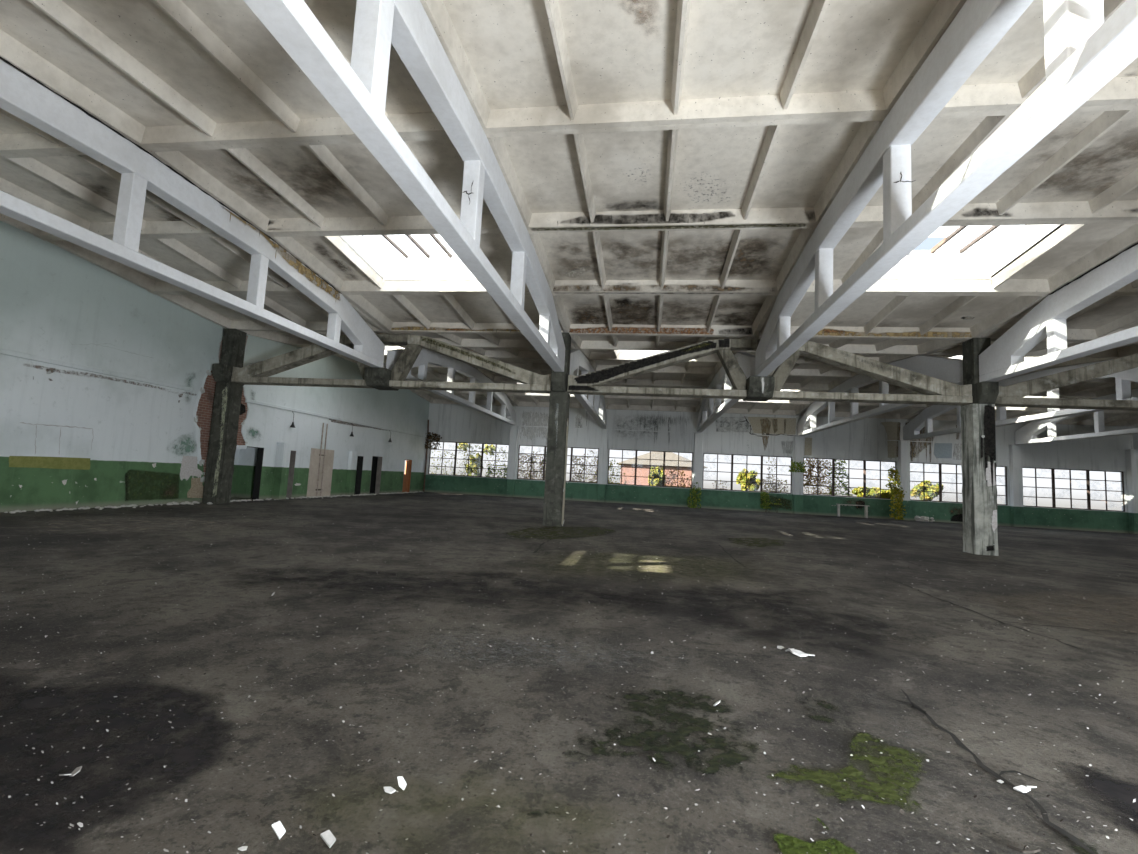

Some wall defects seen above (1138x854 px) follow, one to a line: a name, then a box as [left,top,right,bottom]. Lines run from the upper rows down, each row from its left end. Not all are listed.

damp [1045,140,1138,189]
damp [532,179,814,326]
damp [568,339,730,391]
flaking render [236,385,251,450]
crack [890,689,1096,854]